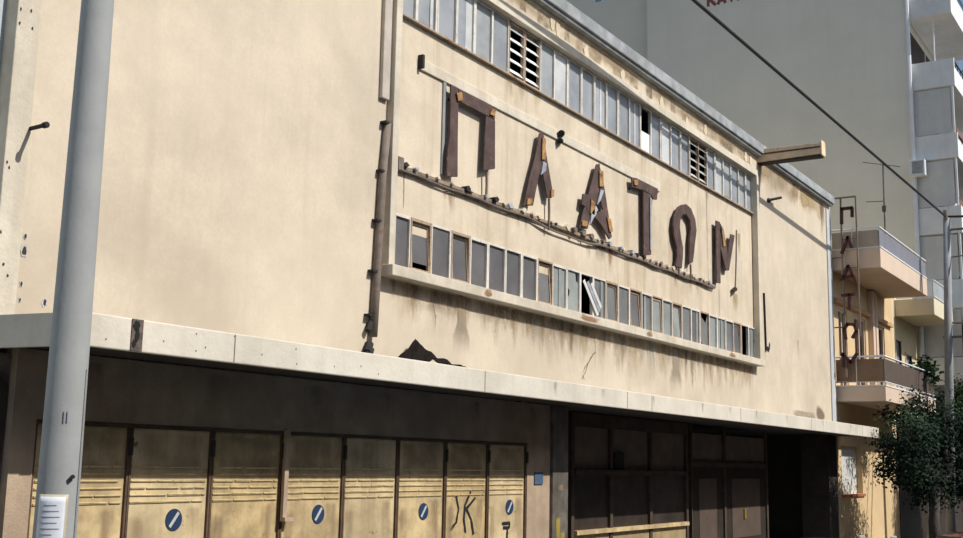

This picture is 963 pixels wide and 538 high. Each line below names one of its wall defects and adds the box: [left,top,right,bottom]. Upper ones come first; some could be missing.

damp [456,296,468,334]
damp [482,303,584,338]
damp [623,338,718,376]
flaking render [0,373,9,464]